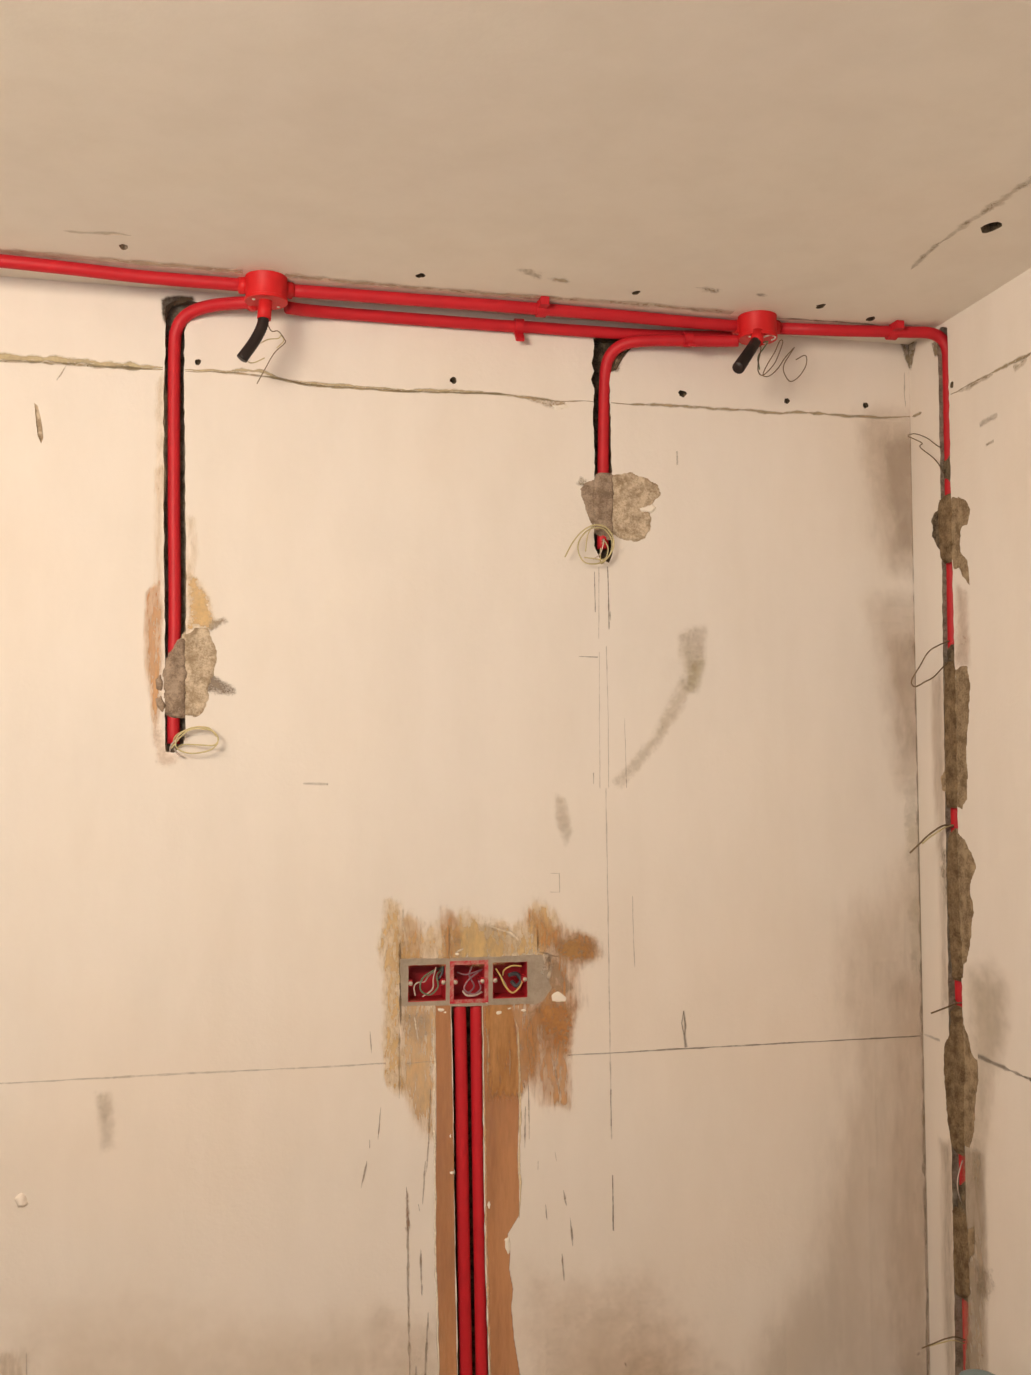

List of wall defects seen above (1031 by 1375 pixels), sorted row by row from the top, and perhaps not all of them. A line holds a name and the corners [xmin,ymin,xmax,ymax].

flaking render [155,675,166,712]
spalling [182,628,217,717]
spalling [552,991,567,1002]
flaking render [433,1005,457,1375]
flaking render [483,1002,526,1375]